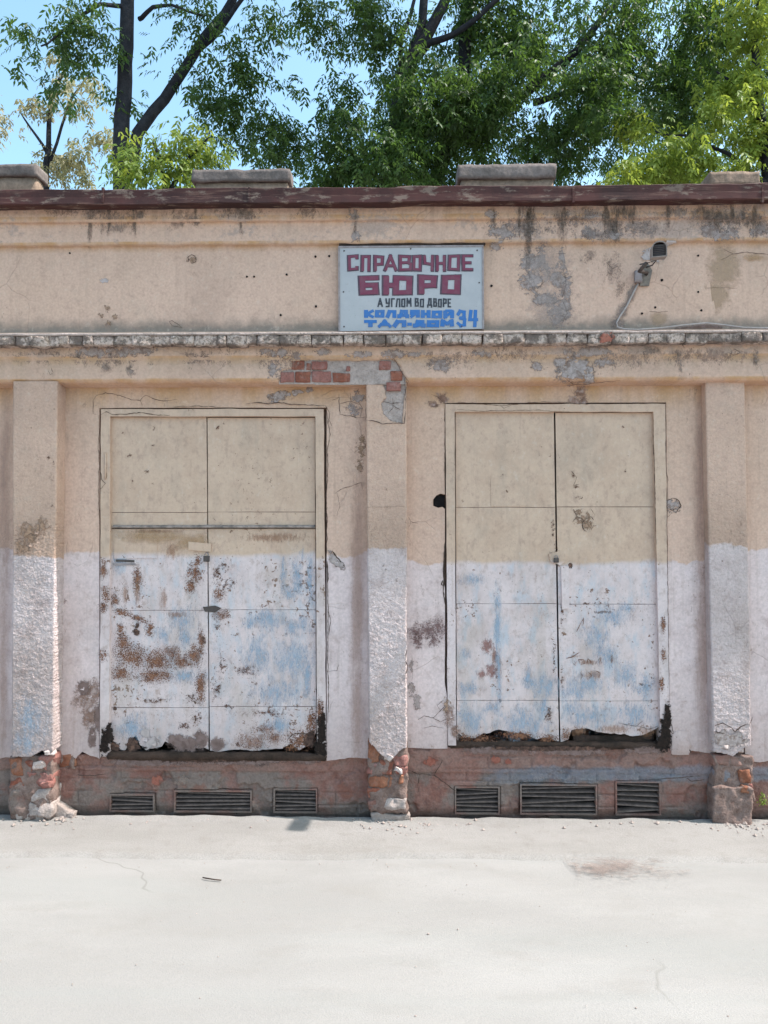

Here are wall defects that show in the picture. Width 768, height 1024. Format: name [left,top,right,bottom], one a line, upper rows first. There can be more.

leakage [517,207,535,264]
leakage [603,206,635,243]
peeling [484,204,768,329]
leakage [697,205,766,229]
flaking render [259,332,759,423]
corrosion [98,553,327,757]
corrosion [474,632,515,678]
flaking render [8,704,77,820]
peeling [140,727,160,750]
flaking render [366,738,409,814]
flaking render [706,726,755,825]